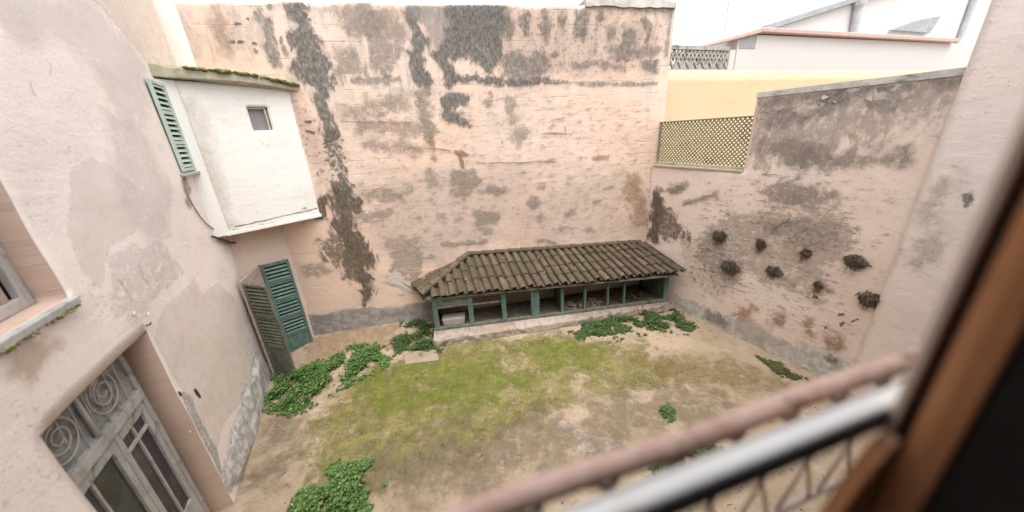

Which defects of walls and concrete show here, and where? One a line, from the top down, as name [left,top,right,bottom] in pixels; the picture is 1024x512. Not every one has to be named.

water stain [253,2,674,336]
water stain [646,182,717,245]
water stain [749,75,963,208]